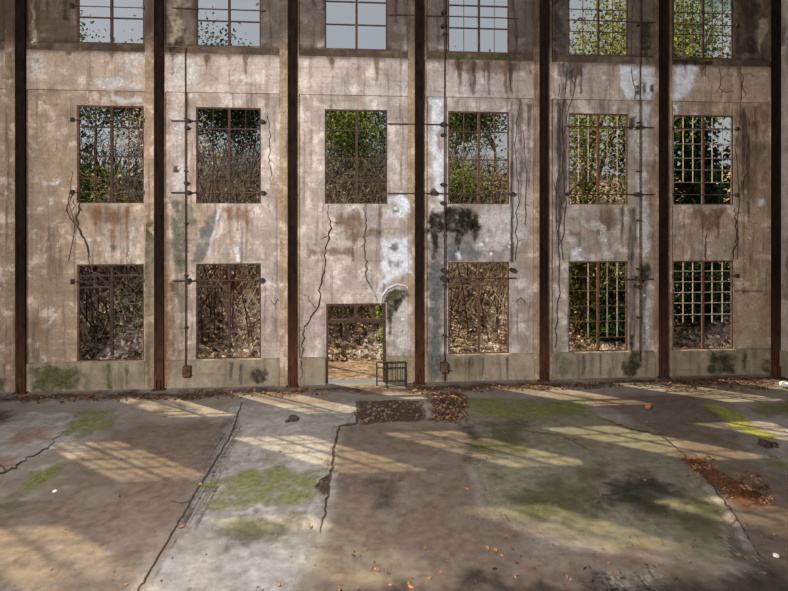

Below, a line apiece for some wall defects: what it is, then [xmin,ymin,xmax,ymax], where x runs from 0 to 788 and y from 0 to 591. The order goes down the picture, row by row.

water stain [450,54,520,85]
peeling [673,65,698,111]
peeling [620,66,653,257]
crack [66,189,90,263]
crack [300,205,341,385]
crack [362,208,377,299]
flaking render [377,238,412,293]
flaking render [389,192,410,217]
crack [0,434,62,474]
crack [137,402,242,591]
crack [316,403,358,529]